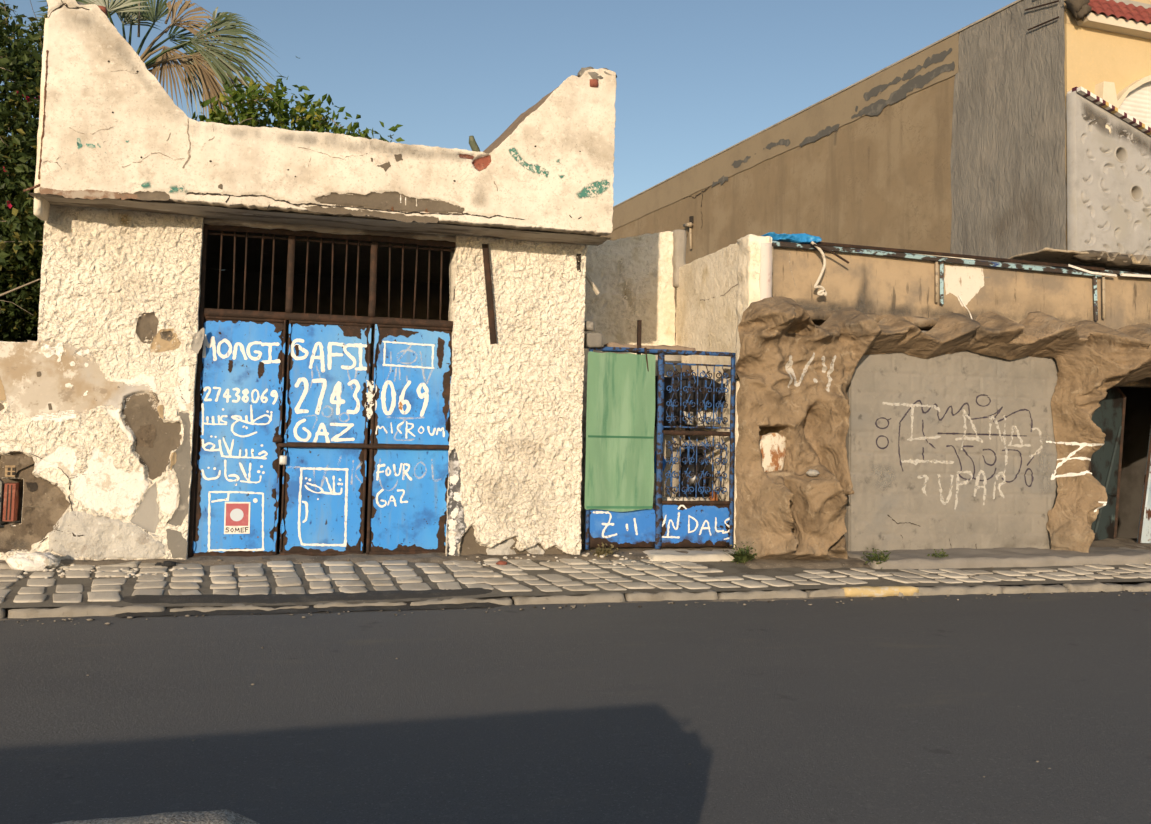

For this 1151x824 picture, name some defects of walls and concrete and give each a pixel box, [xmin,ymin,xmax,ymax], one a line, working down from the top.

crack [122,119,525,220]
spalling [295,191,465,224]
flaking render [459,154,491,171]
peeling [136,313,181,352]
rust [482,244,497,344]
peeling [0,340,191,553]
peeling [166,529,188,559]
peeling [446,449,572,565]